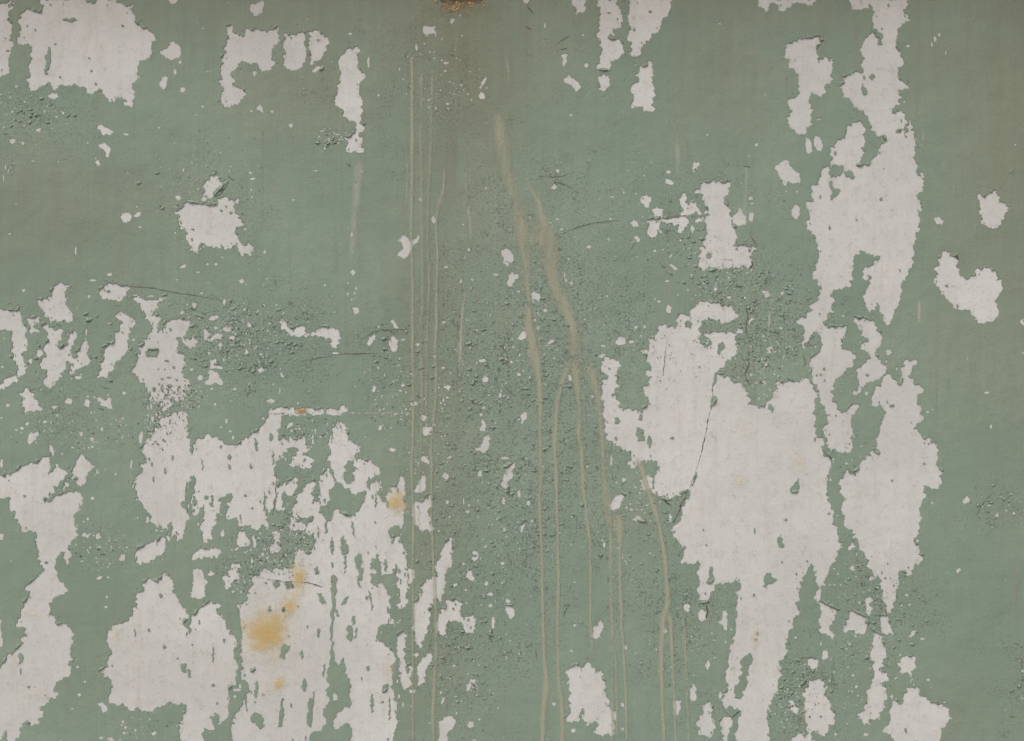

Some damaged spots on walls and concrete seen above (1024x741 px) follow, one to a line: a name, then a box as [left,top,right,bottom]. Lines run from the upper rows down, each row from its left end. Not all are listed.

peeling [0,0,181,147]
peeling [206,1,369,153]
peeling [567,0,672,112]
peeling [0,155,627,741]
water stain [410,59,445,741]
water stain [494,116,627,741]
crack [639,386,713,526]
peeling [586,0,954,741]
peeling [933,250,1003,324]
water stain [636,460,689,741]